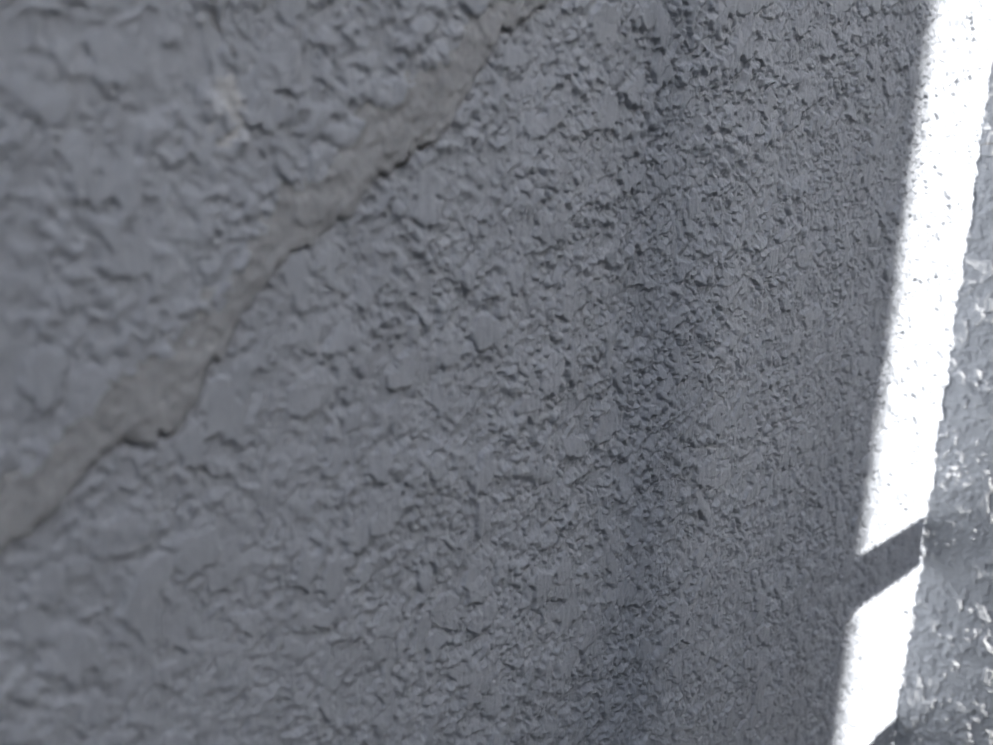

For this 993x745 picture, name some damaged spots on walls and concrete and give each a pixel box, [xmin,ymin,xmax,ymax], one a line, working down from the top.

crack [0,0,549,551]